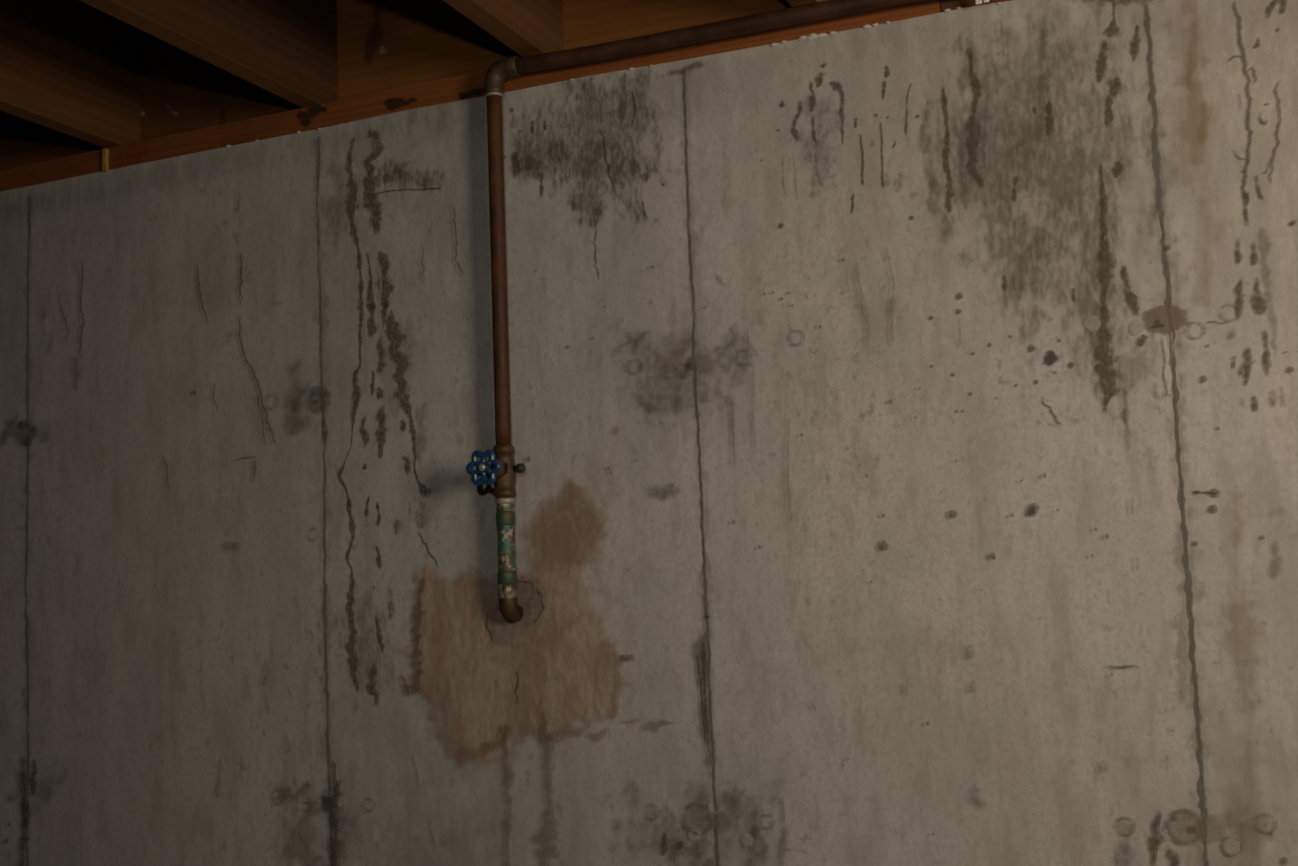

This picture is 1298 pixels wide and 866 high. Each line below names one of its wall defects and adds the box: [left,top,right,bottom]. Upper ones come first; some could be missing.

leakage [504,65,665,226]
leakage [942,88,954,211]
leakage [965,49,982,186]
leakage [1097,0,1131,125]
leakage [1131,26,1140,61]
crack [1230,2,1282,222]
crack [196,256,275,444]
leakage [338,130,443,704]
leakage [1095,162,1139,411]
leakage [1163,339,1172,394]